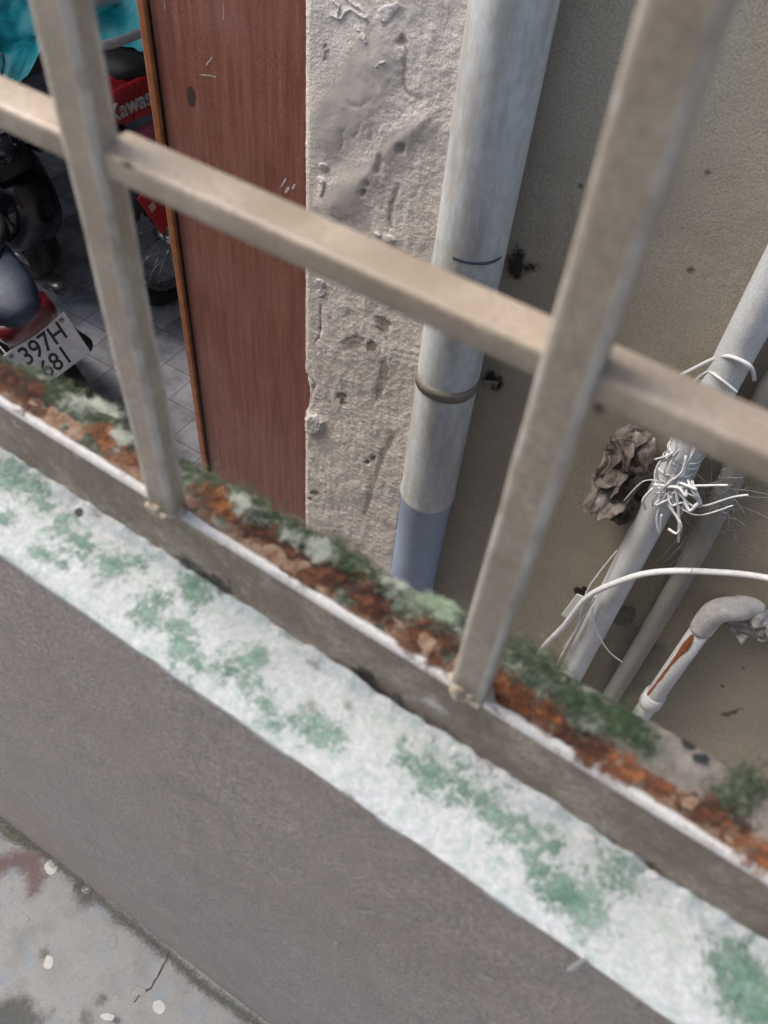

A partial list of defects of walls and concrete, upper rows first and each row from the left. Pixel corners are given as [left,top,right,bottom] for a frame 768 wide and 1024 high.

peeling [331,0,400,44]
peeling [317,162,328,196]
hole [361,155,383,196]
spalling [342,317,390,399]
water stain [224,490,257,516]
water stain [279,528,333,564]
water stain [381,575,464,624]
corrosion [647,634,694,696]
water stain [681,738,709,762]